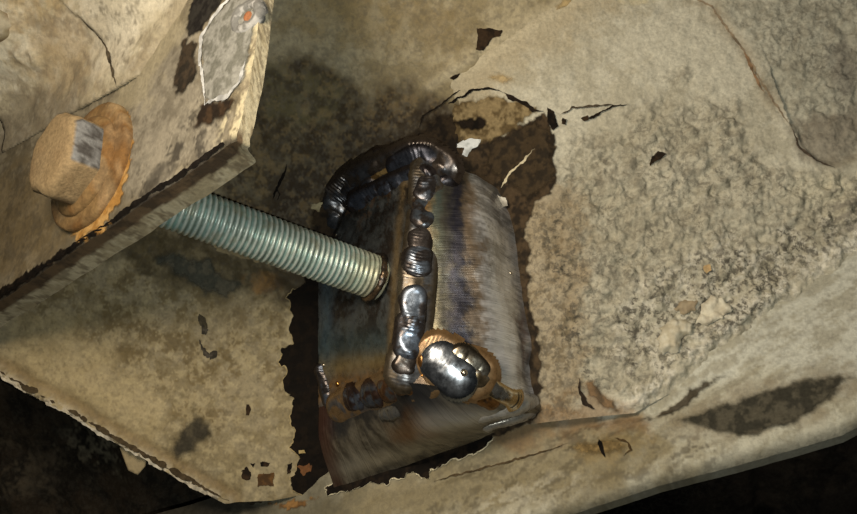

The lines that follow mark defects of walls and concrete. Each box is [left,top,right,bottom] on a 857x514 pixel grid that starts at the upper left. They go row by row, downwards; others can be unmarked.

crack [697,0,833,167]
crack [419,87,541,128]
peeling [547,107,558,130]
crack [562,104,627,125]
corrosion [73,140,134,242]
peeling [198,314,217,360]
peeling [277,276,494,497]
damp [644,376,845,436]
damp [174,418,211,457]
peeling [241,461,270,480]